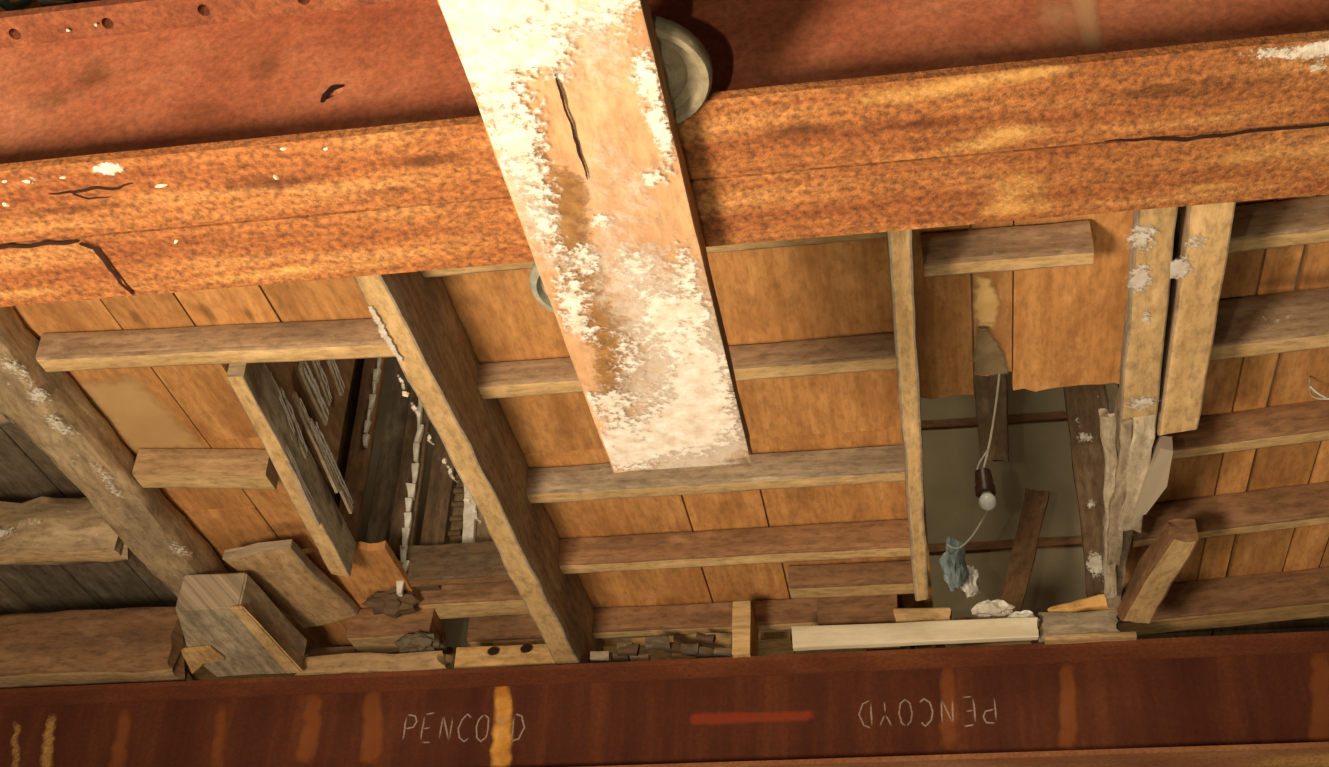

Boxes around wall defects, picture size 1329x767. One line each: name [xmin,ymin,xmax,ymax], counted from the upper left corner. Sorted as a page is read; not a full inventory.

water stain [1257,41,1329,72]
corrosion [878,67,1066,101]
crack [551,67,588,180]
corrosion [965,127,1030,149]
crack [1105,123,1329,142]
crack [49,183,133,200]
corrosion [986,177,1042,214]
crack [0,240,133,295]
water stain [528,144,640,396]
peeling [973,276,1000,328]